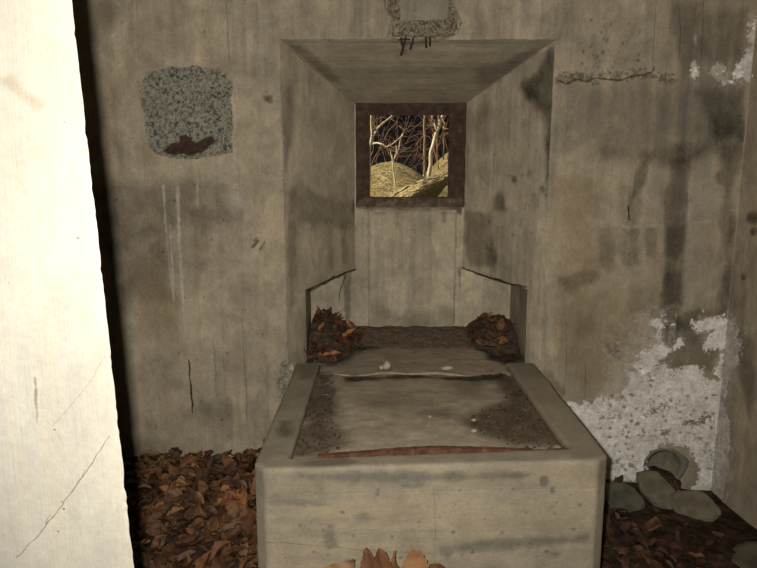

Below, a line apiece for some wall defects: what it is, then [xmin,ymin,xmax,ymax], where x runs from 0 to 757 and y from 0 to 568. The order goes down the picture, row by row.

spalling [384,0,462,41]
spalling [140,65,233,159]
corrosion [164,135,215,156]
crack [186,360,194,413]